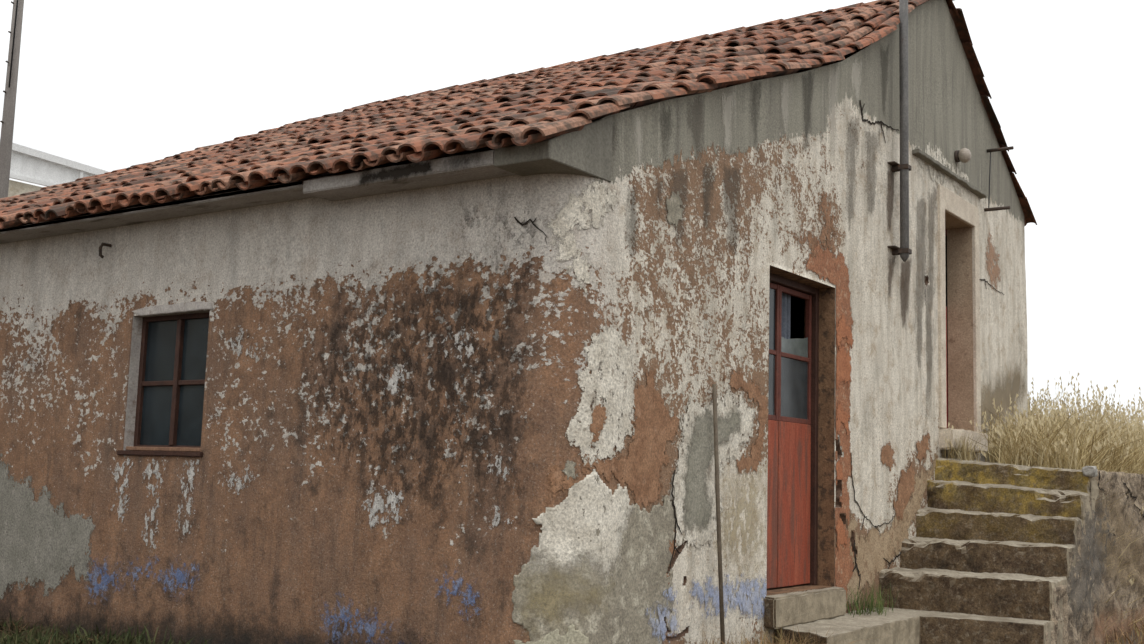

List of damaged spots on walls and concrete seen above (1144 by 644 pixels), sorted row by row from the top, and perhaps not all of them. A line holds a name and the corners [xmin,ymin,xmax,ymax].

crack [859,100,899,143]
peeling [985,232,1001,292]
peeling [227,325,261,360]
peeling [383,363,411,398]
spalling [794,192,938,607]
peeling [0,454,199,604]
peeling [222,459,258,495]
peeling [363,481,407,528]
peeling [512,324,769,644]
crack [670,470,682,569]
crack [851,453,901,587]